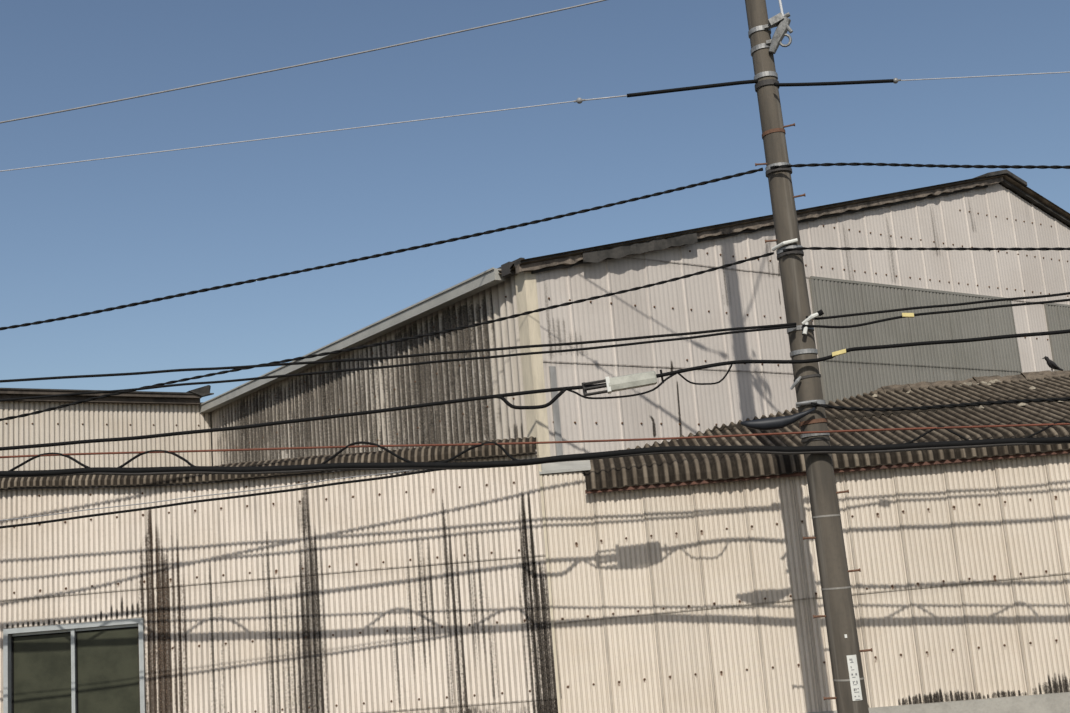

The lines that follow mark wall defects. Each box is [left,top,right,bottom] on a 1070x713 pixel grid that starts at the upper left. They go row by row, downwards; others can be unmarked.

damp [218,294,501,464]
damp [6,509,187,713]
damp [267,563,280,713]
damp [291,481,329,713]
damp [409,551,434,653]
damp [441,506,494,713]
damp [519,494,561,713]
damp [898,675,1069,705]